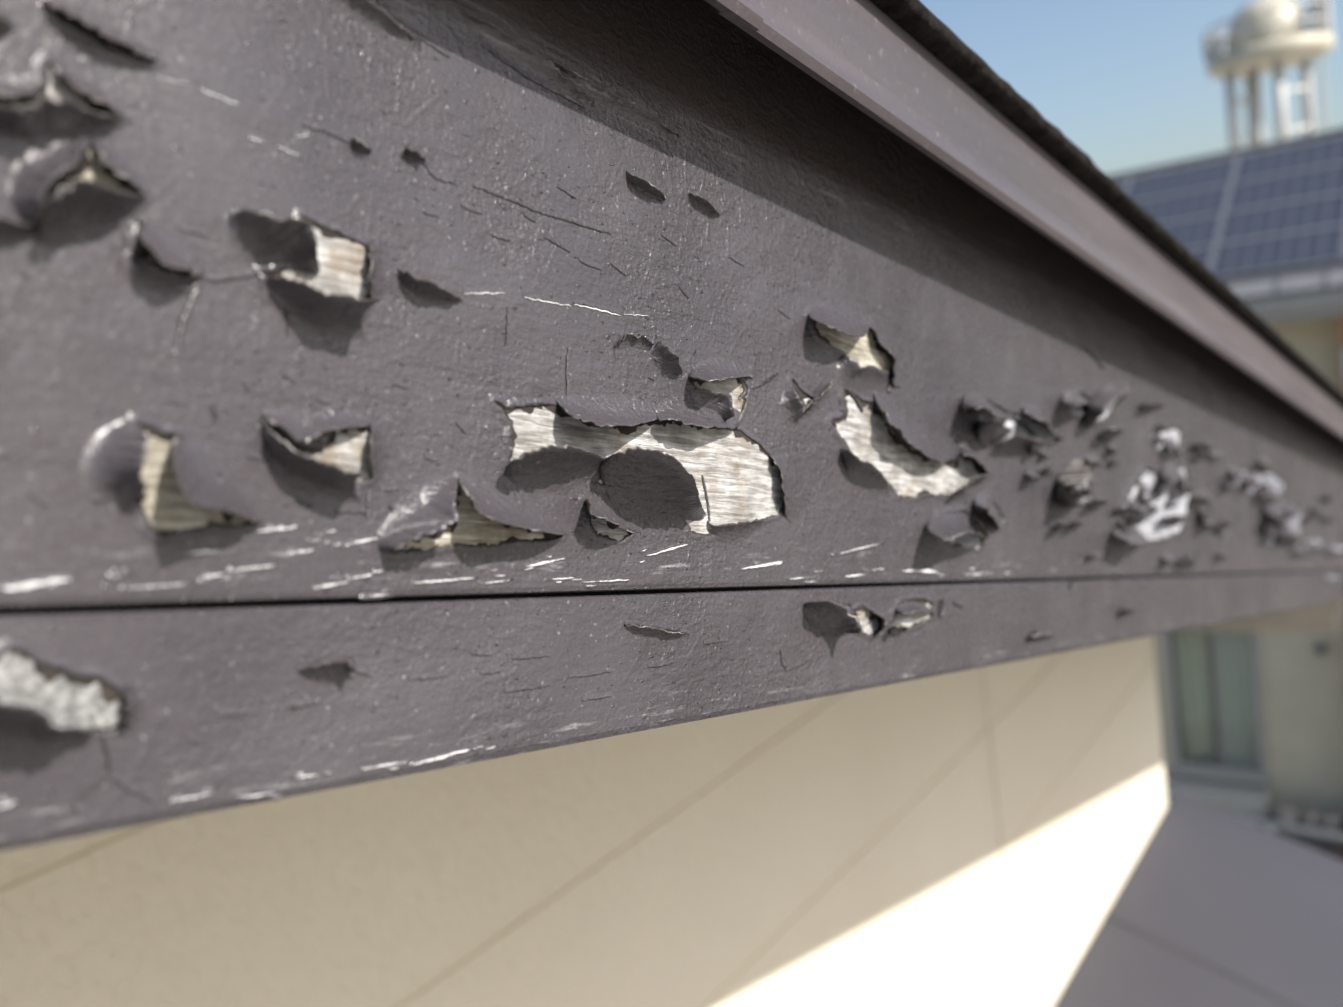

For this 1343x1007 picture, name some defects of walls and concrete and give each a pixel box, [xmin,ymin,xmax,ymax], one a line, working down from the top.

peeling [0,7,21,41]
peeling [0,50,157,251]
peeling [225,206,463,344]
peeling [78,295,1343,582]
peeling [804,593,964,641]
peeling [0,638,158,814]